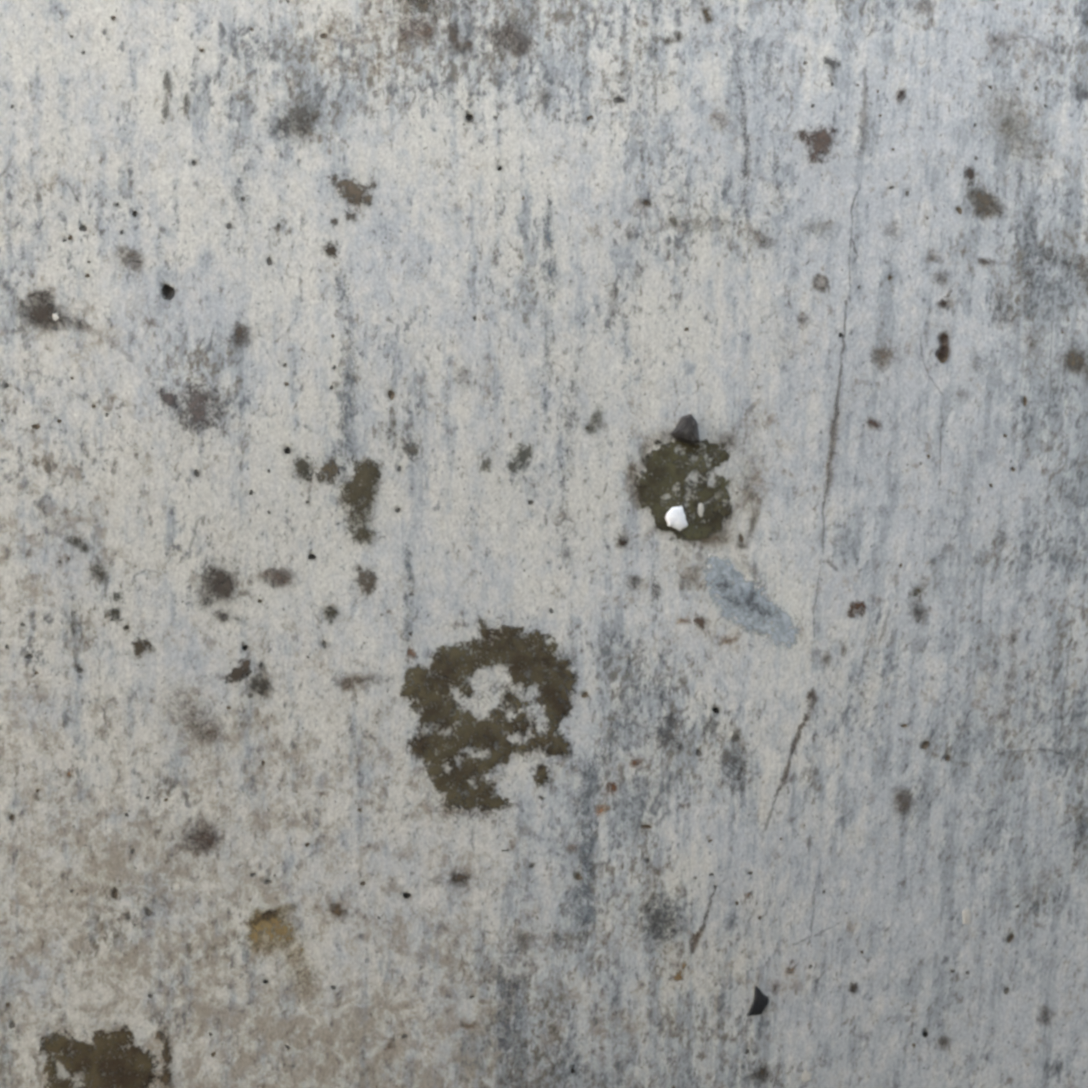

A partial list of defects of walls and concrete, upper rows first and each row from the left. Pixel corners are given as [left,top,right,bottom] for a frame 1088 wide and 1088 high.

leakage [449,23,473,51]
leakage [492,23,532,54]
leakage [295,368,385,544]
leakage [686,486,759,548]
crack [775,689,817,796]
crack [689,893,714,953]